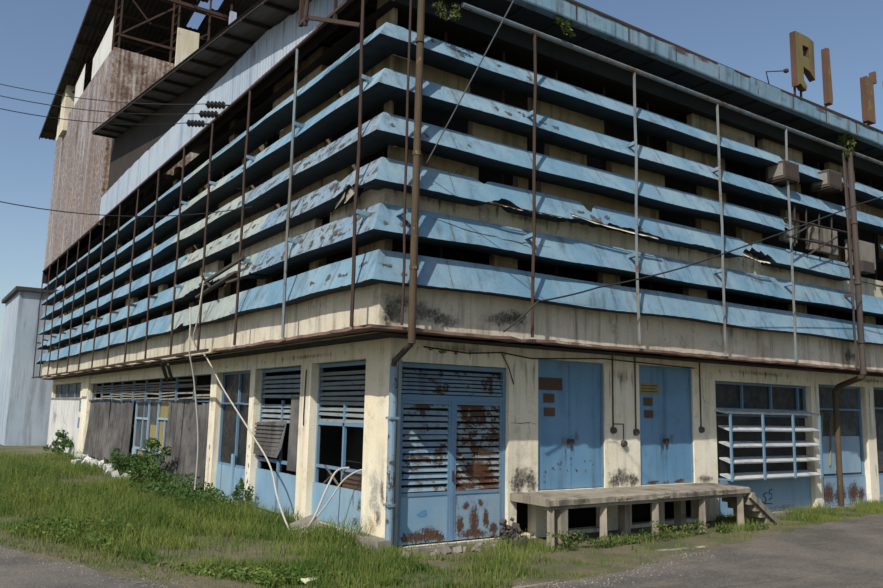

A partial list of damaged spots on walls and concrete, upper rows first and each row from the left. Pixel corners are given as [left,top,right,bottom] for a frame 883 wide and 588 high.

peeling [571,210,657,238]
leakage [384,298,455,326]
leakage [489,312,520,326]
rust [460,448,494,488]
leakage [514,468,536,490]
leakage [611,470,638,486]
rust [455,499,498,538]
rust [400,528,445,543]